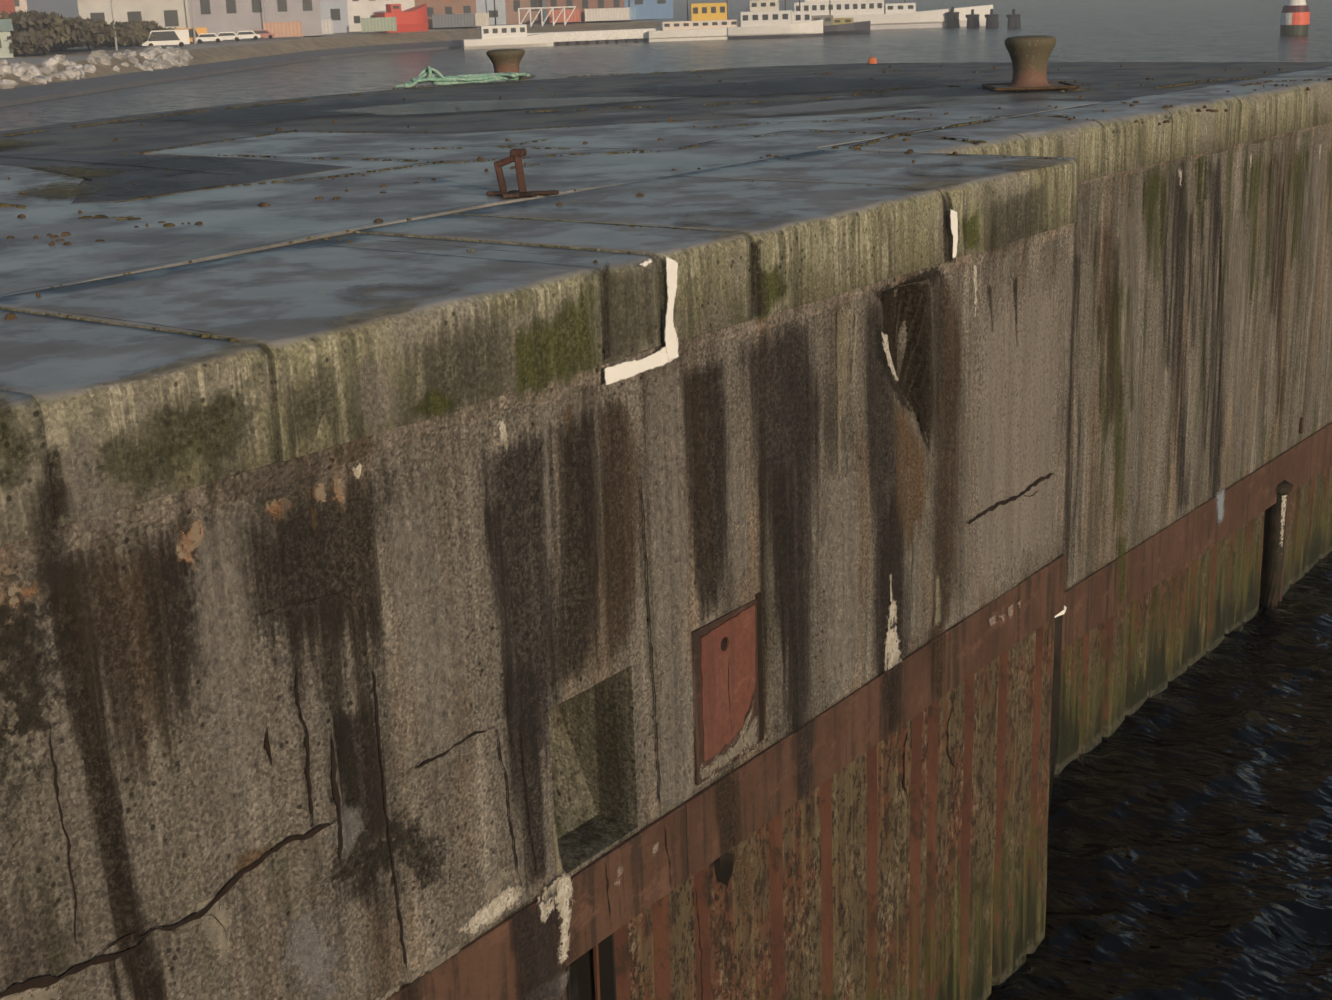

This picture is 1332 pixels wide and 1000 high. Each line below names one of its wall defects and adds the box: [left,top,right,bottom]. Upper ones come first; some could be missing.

damp [0,438,167,1000]
crack [0,664,539,1000]
corrosion [266,497,290,523]
damp [149,481,462,883]
corrosion [309,464,362,530]
damp [484,412,599,1000]
corrosion [601,401,642,655]
spalling [877,268,940,452]
corrosion [936,278,960,629]
crack [968,473,1054,524]
damp [1066,201,1081,574]
damp [1164,163,1249,522]